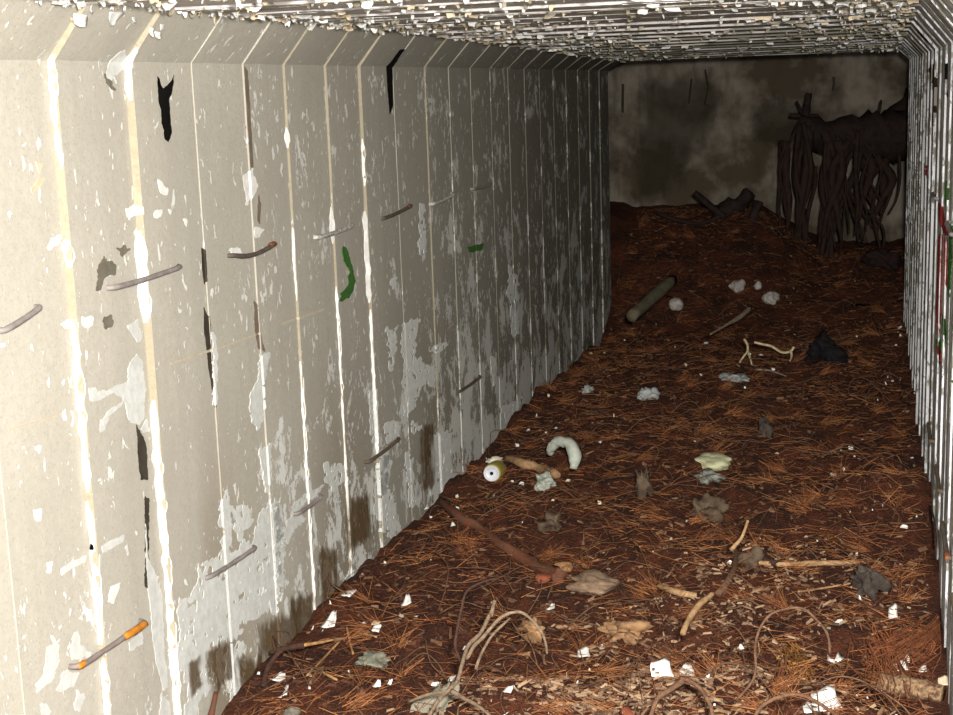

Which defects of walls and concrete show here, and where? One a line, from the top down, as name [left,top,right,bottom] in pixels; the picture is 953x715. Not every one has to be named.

peeling [35,0,919,63]
peeling [47,55,64,169]
peeling [47,234,75,268]
peeling [125,204,172,220]
peeling [243,168,258,206]
peeling [418,203,427,255]
peeling [95,231,152,342]
peeling [506,264,520,337]
peeling [362,211,453,538]
peeling [501,397,522,424]
peeling [35,287,349,715]